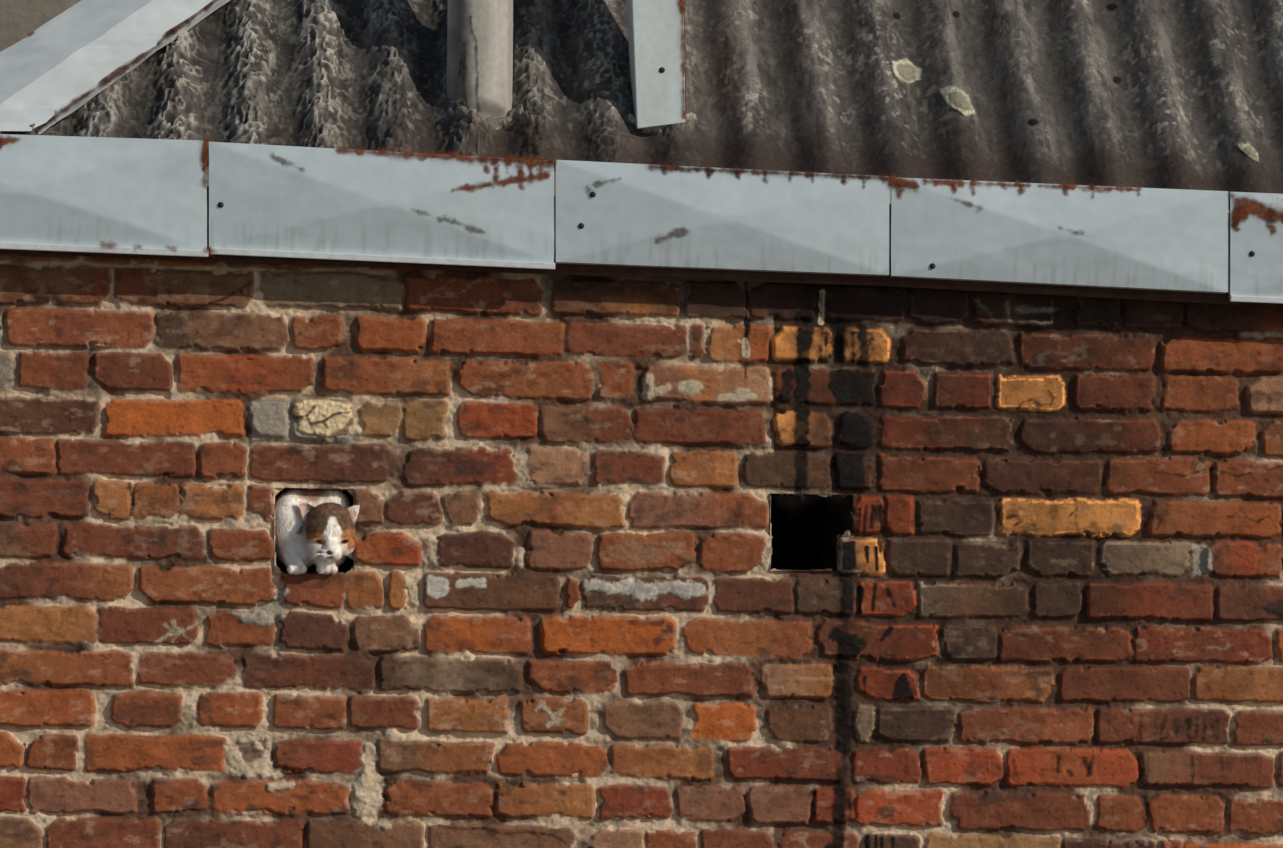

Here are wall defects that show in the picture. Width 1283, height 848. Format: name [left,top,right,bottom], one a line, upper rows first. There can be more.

rust [33,0,215,132]
rust [202,137,212,186]
rust [337,148,556,191]
rust [650,164,1140,198]
rust [1231,195,1283,234]
water stain [742,285,874,499]
crack [297,405,348,434]
spalling [770,493,853,571]
water stain [862,505,883,571]
water stain [840,566,864,613]
water stain [829,626,894,659]